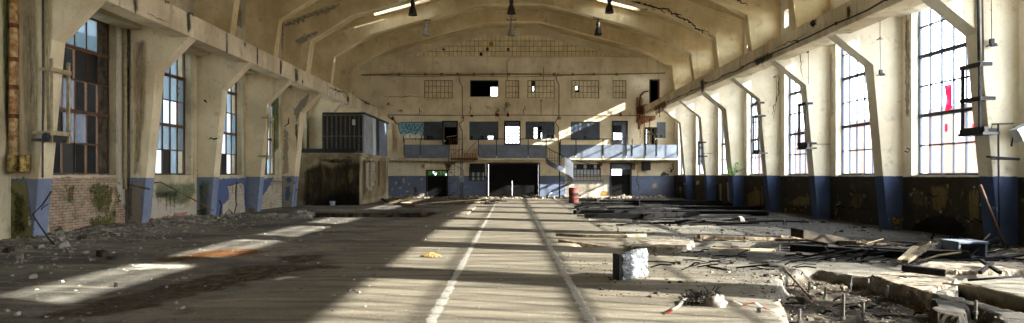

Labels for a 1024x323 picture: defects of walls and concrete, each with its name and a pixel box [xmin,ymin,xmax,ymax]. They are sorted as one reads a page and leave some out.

crack [647,5,713,36]
spalling [49,93,311,232]